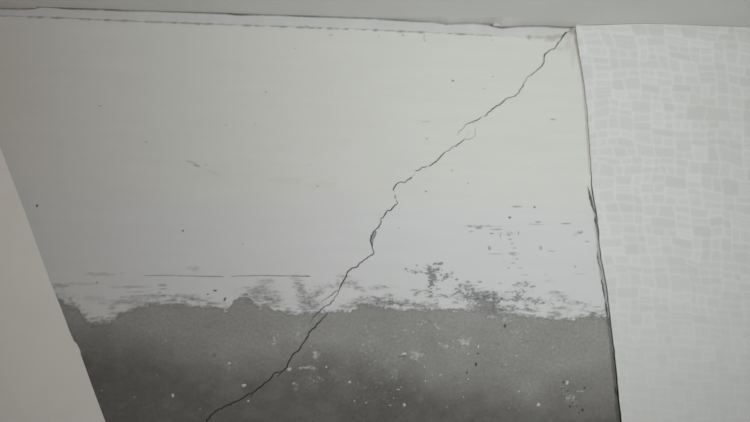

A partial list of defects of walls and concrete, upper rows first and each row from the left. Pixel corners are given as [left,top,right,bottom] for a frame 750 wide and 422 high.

leakage [83,359,619,422]
crack [206,32,567,422]